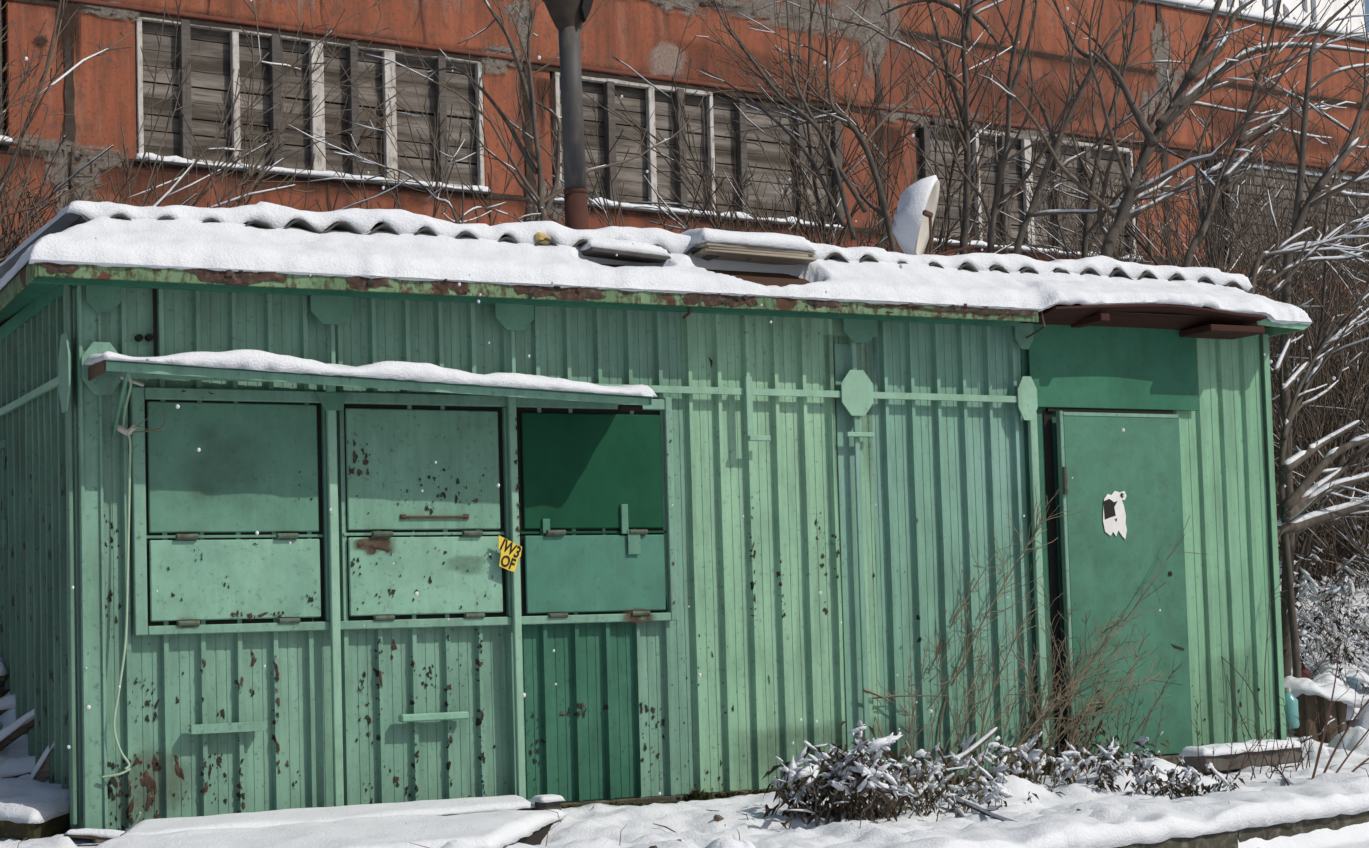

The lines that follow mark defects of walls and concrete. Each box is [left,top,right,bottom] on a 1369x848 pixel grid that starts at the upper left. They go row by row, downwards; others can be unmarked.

spalling [651,0,900,76]
spalling [9,133,124,213]
corrosion [346,276,393,291]
corrosion [430,279,470,295]
corrosion [514,285,606,301]
corrosion [682,293,758,307]
corrosion [356,537,391,554]